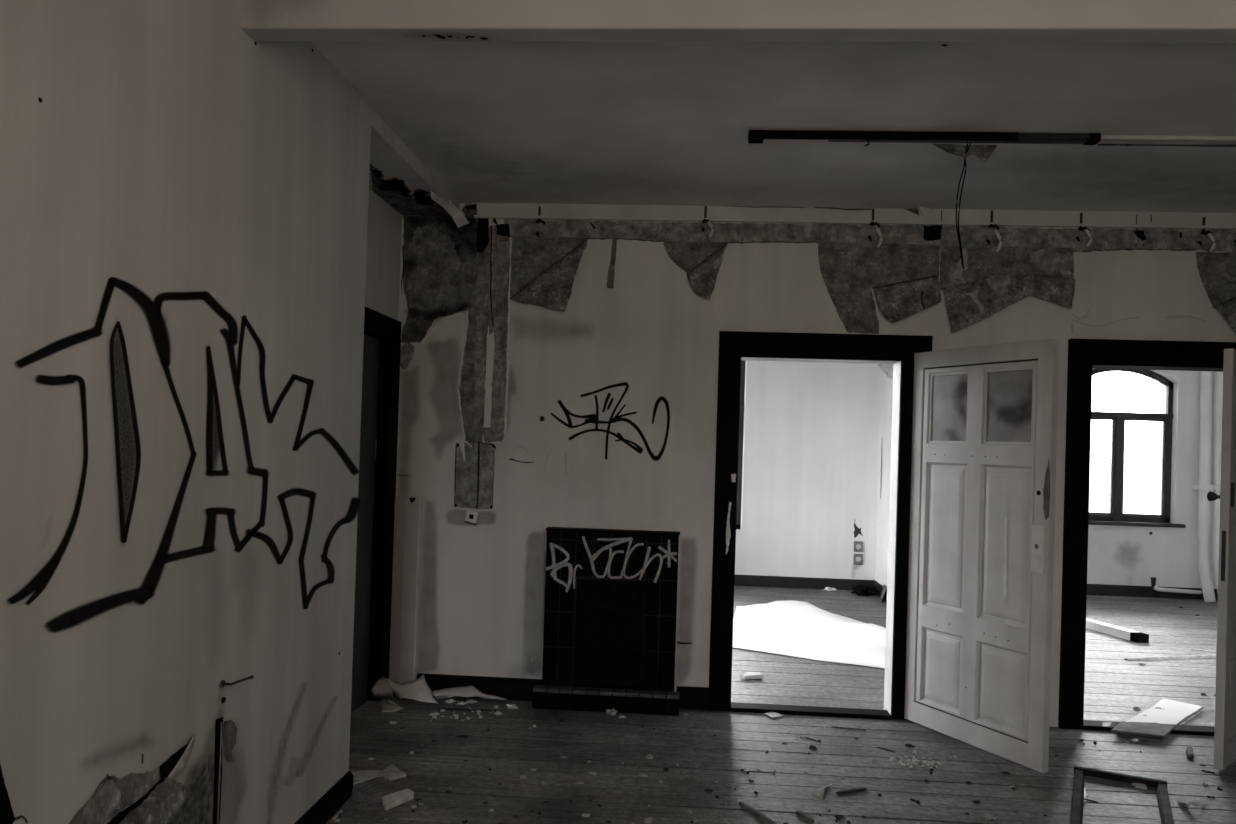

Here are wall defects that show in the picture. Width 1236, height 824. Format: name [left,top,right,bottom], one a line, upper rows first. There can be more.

peeling [369,164,1236,509]
spalling [0,764,15,824]
flaking render [69,765,161,824]
spalling [171,717,237,824]